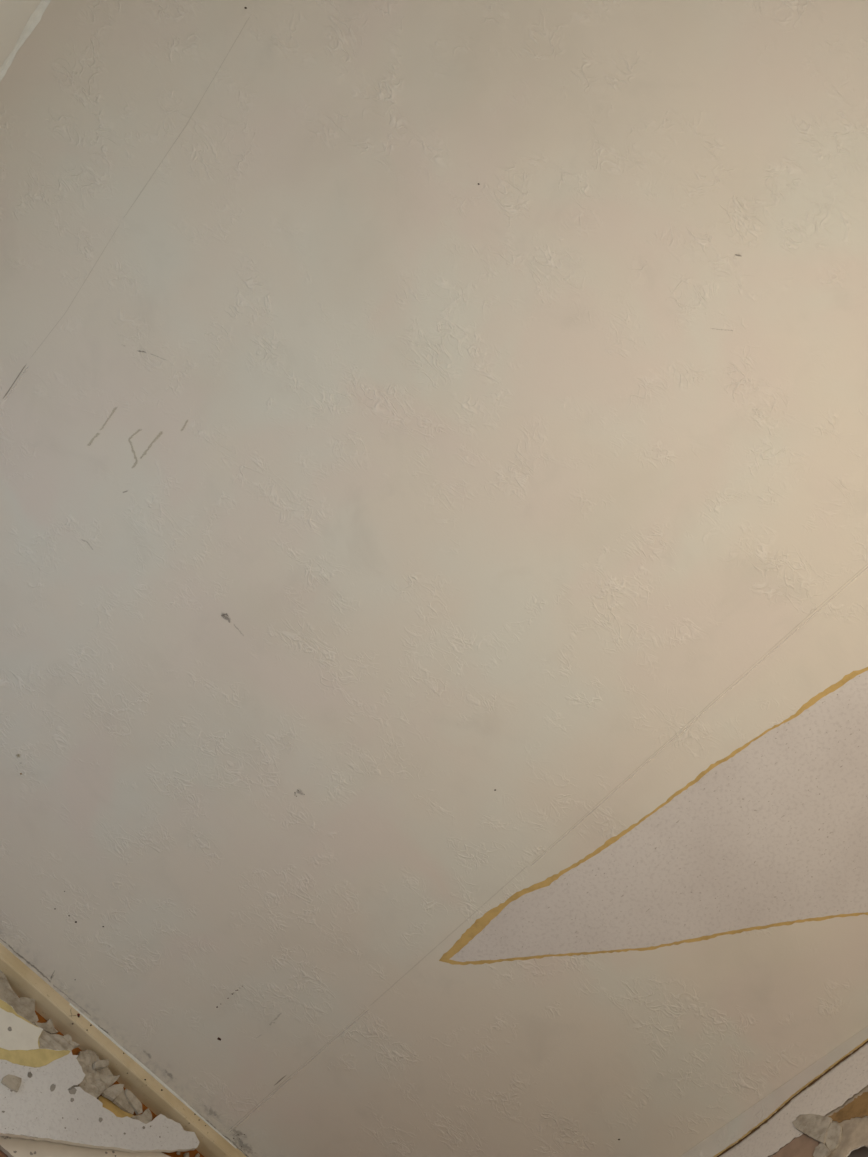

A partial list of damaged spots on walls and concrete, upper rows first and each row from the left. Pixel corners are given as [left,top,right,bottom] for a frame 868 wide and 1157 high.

peeling [439,667,868,965]
peeling [792,1114,842,1157]